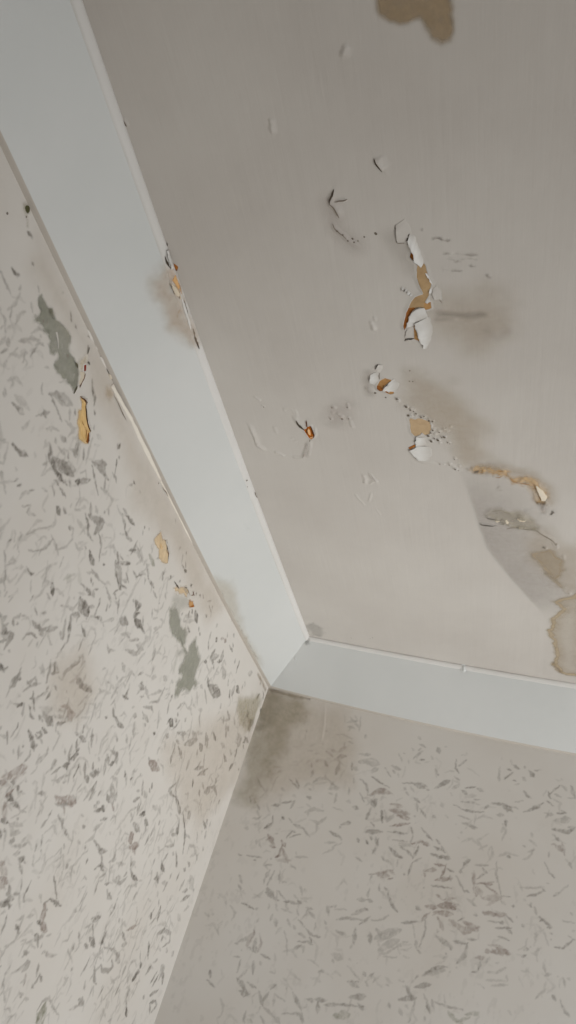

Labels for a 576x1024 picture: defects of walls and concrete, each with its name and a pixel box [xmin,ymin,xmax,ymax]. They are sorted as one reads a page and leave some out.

water stain [378,0,453,41]
peeling [395,219,443,349]
peeling [363,365,454,465]
water stain [473,465,551,512]
water stain [532,542,576,676]